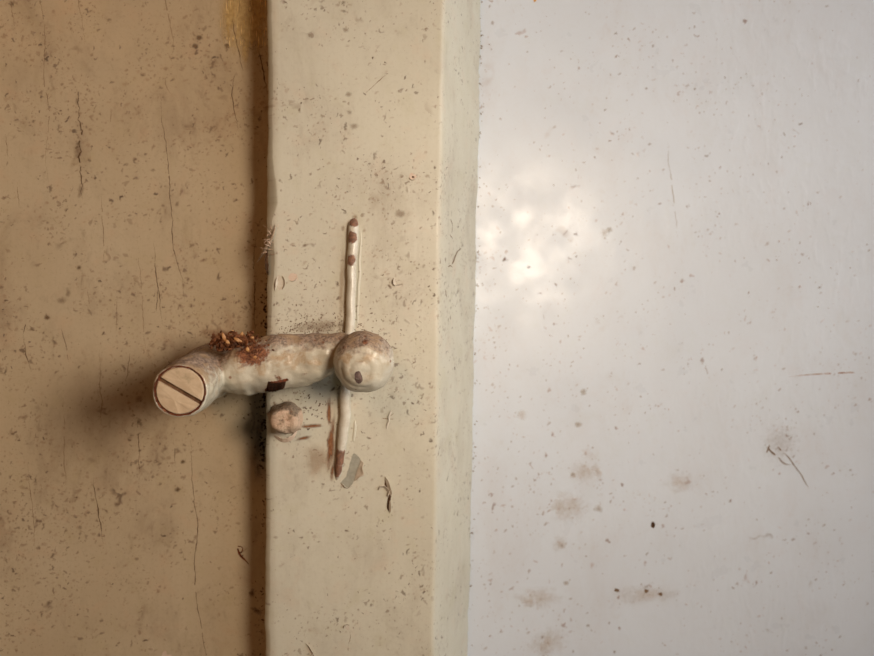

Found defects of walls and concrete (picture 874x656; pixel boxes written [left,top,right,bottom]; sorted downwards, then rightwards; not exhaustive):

crack [77,96,105,257]
peeling [341,453,364,489]